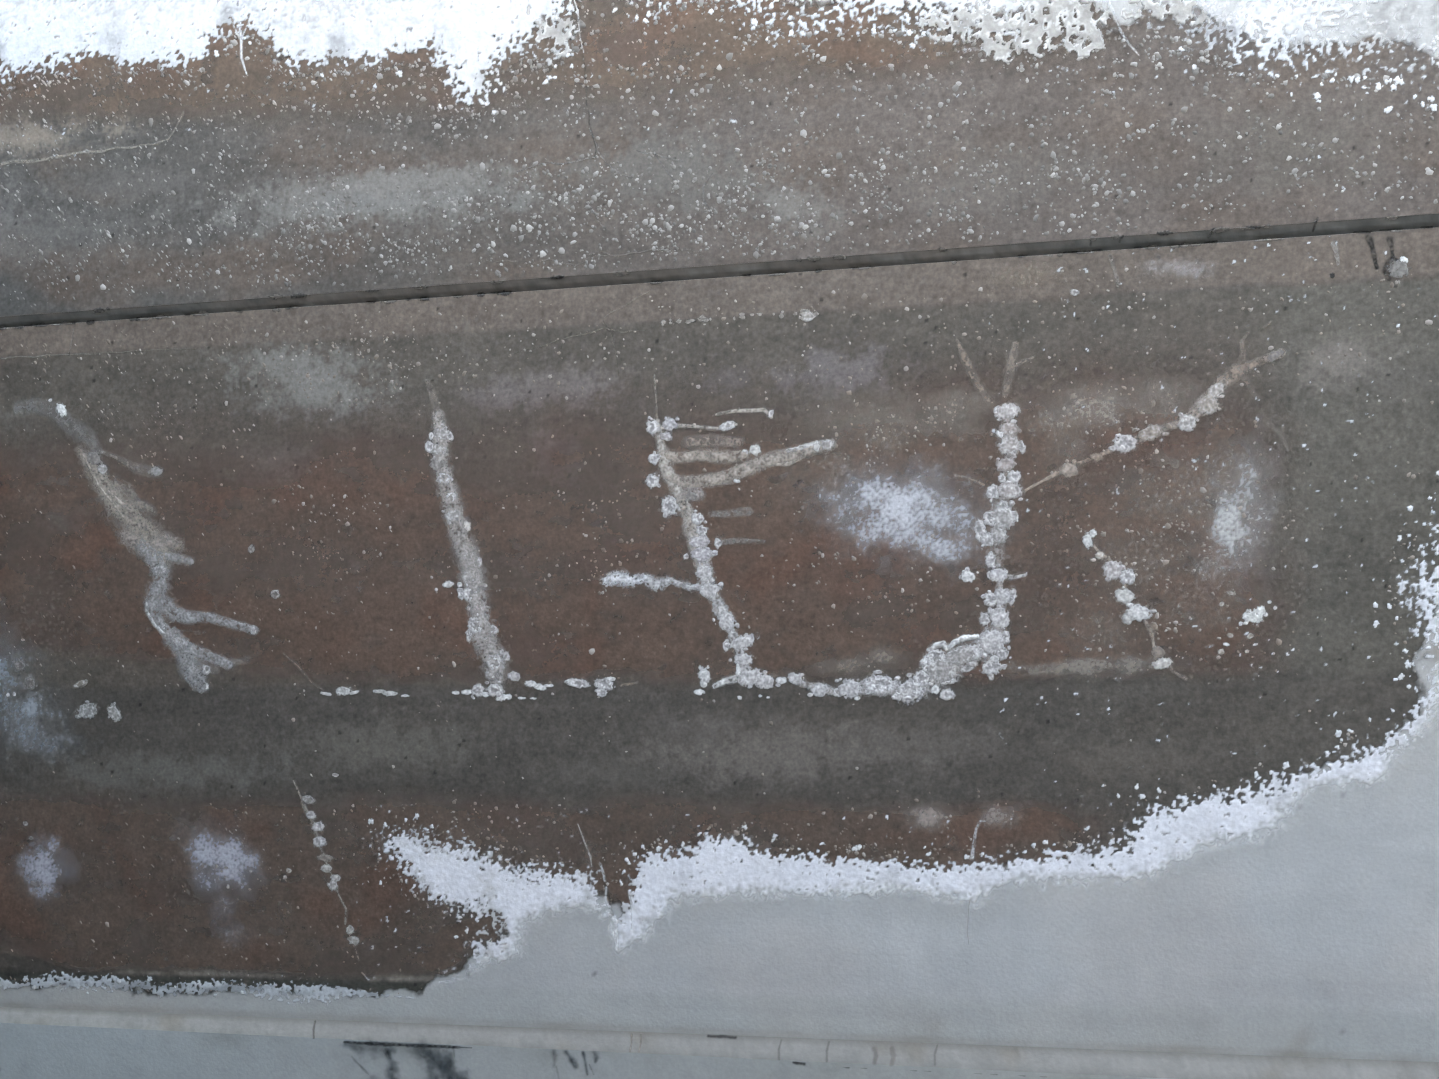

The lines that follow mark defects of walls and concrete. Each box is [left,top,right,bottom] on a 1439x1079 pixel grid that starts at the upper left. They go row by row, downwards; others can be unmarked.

rust [0,0,1083,118]
peeling [534,13,575,59]
peeling [919,0,1211,63]
water stain [0,0,1439,317]
rust [0,375,1282,683]
water stain [0,227,1439,1004]
rust [0,795,1096,976]